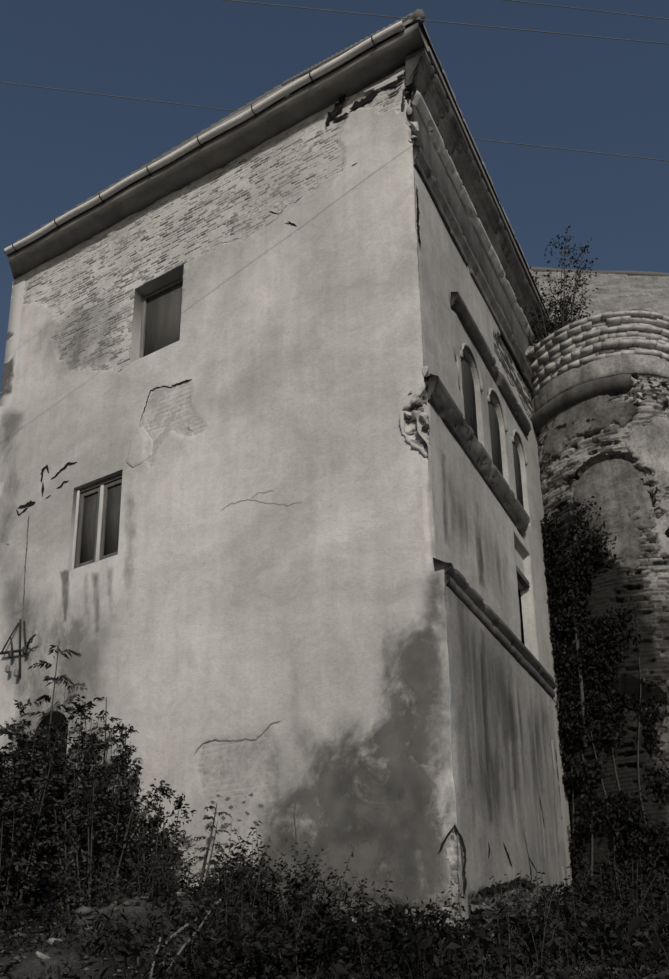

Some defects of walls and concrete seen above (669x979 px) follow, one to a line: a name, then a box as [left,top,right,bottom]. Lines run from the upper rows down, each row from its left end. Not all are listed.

peeling [23,65,419,372]
peeling [139,379,206,466]
spalling [398,366,431,458]
spalling [624,372,669,408]
crack [223,490,303,509]
water stain [3,571,104,809]
spalling [597,674,668,707]
water stain [262,578,455,926]